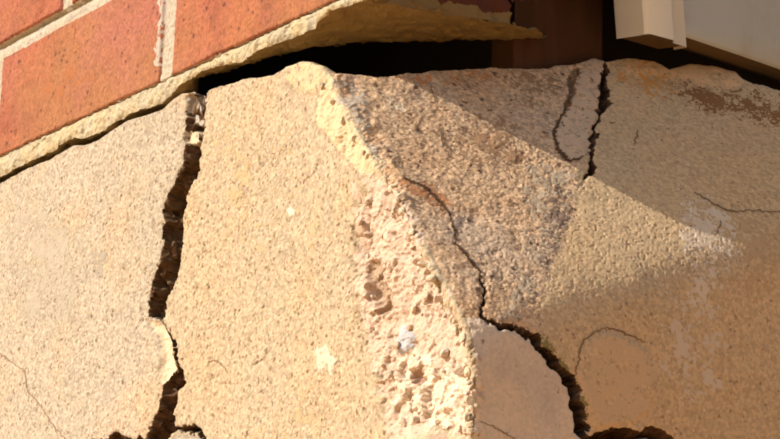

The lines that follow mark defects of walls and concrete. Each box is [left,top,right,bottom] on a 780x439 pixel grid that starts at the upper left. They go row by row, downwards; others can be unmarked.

crack [438,124,451,158]
crack [552,62,614,180]
crack [91,93,208,439]
spalling [315,69,485,439]
crack [403,178,674,439]
crack [694,191,780,234]
crack [0,353,65,439]